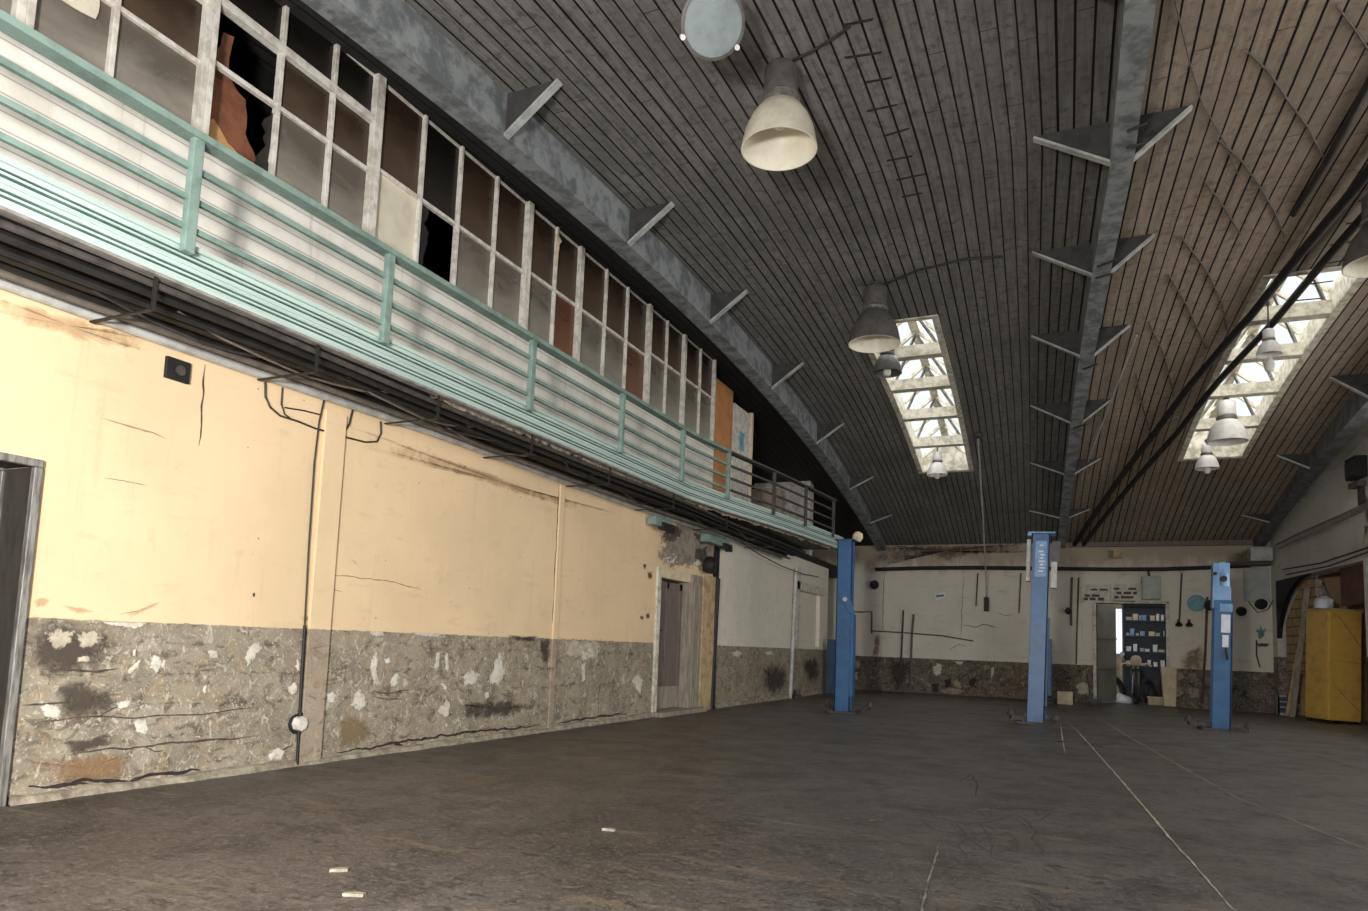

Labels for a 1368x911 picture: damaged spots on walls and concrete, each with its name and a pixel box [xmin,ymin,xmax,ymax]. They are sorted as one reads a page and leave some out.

peeling [45,622,148,662]
spalling [127,649,167,674]
peeling [244,641,262,667]
spalling [40,704,61,719]
spalling [117,700,150,735]
crack [26,668,258,789]